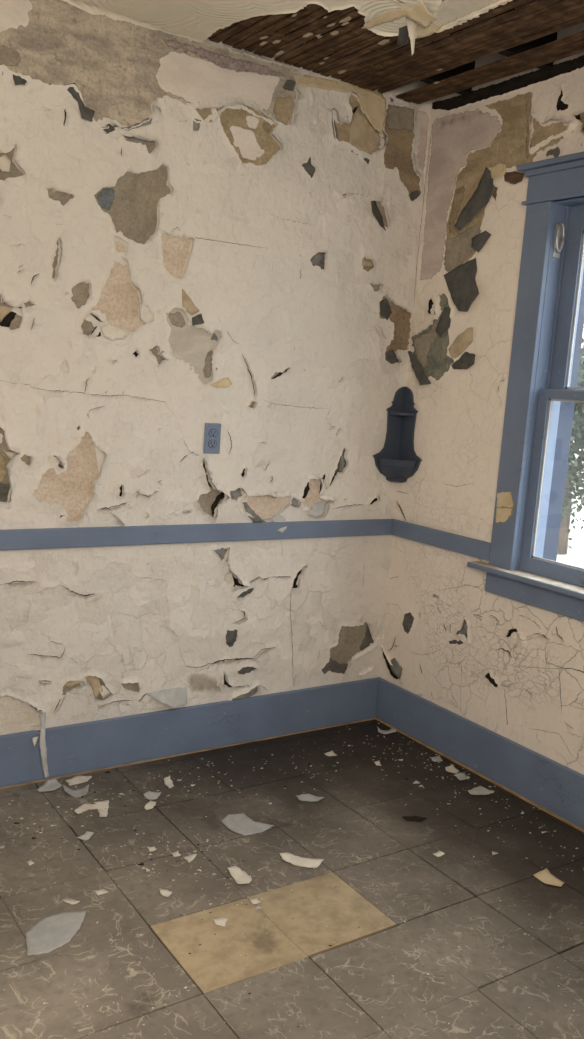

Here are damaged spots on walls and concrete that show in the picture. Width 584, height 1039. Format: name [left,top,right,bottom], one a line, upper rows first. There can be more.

peeling [0,0,584,392]
peeling [0,420,163,528]
peeling [190,445,350,533]
peeling [496,491,514,523]
peeling [207,542,258,605]
peeling [285,561,308,595]
peeling [0,669,187,746]
peeling [221,624,244,652]
peeling [216,660,264,701]
peeling [319,615,404,685]
crack [352,577,584,756]